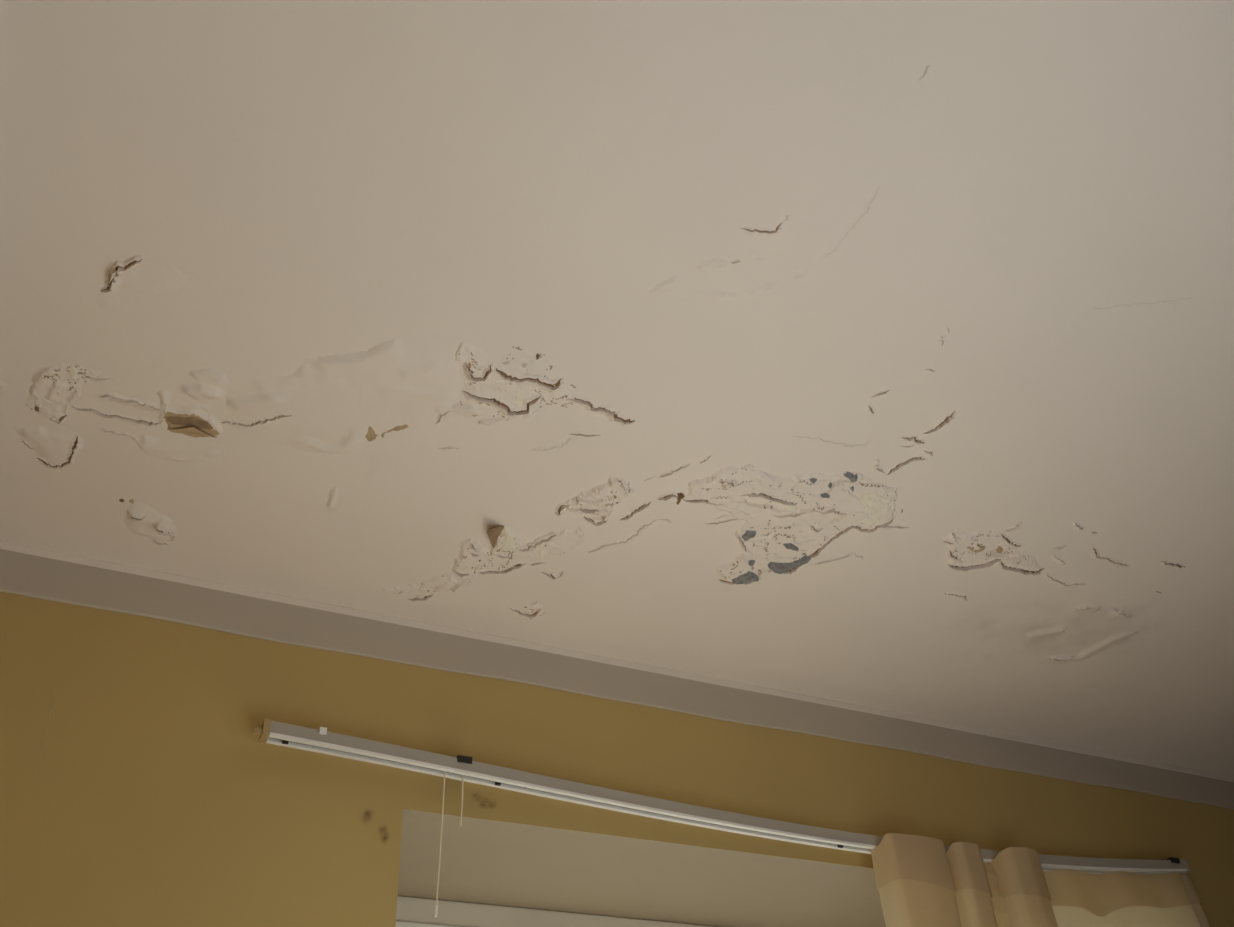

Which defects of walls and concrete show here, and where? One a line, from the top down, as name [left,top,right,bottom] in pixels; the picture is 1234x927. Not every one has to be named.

peeling [100,254,144,293]
peeling [23,363,102,424]
spalling [159,405,223,438]
peeling [440,341,584,426]
crack [792,390,956,475]
peeling [378,477,636,602]
peeling [687,464,899,585]
peeling [943,521,1045,576]
crack [1044,522,1130,587]
crack [1160,560,1186,569]